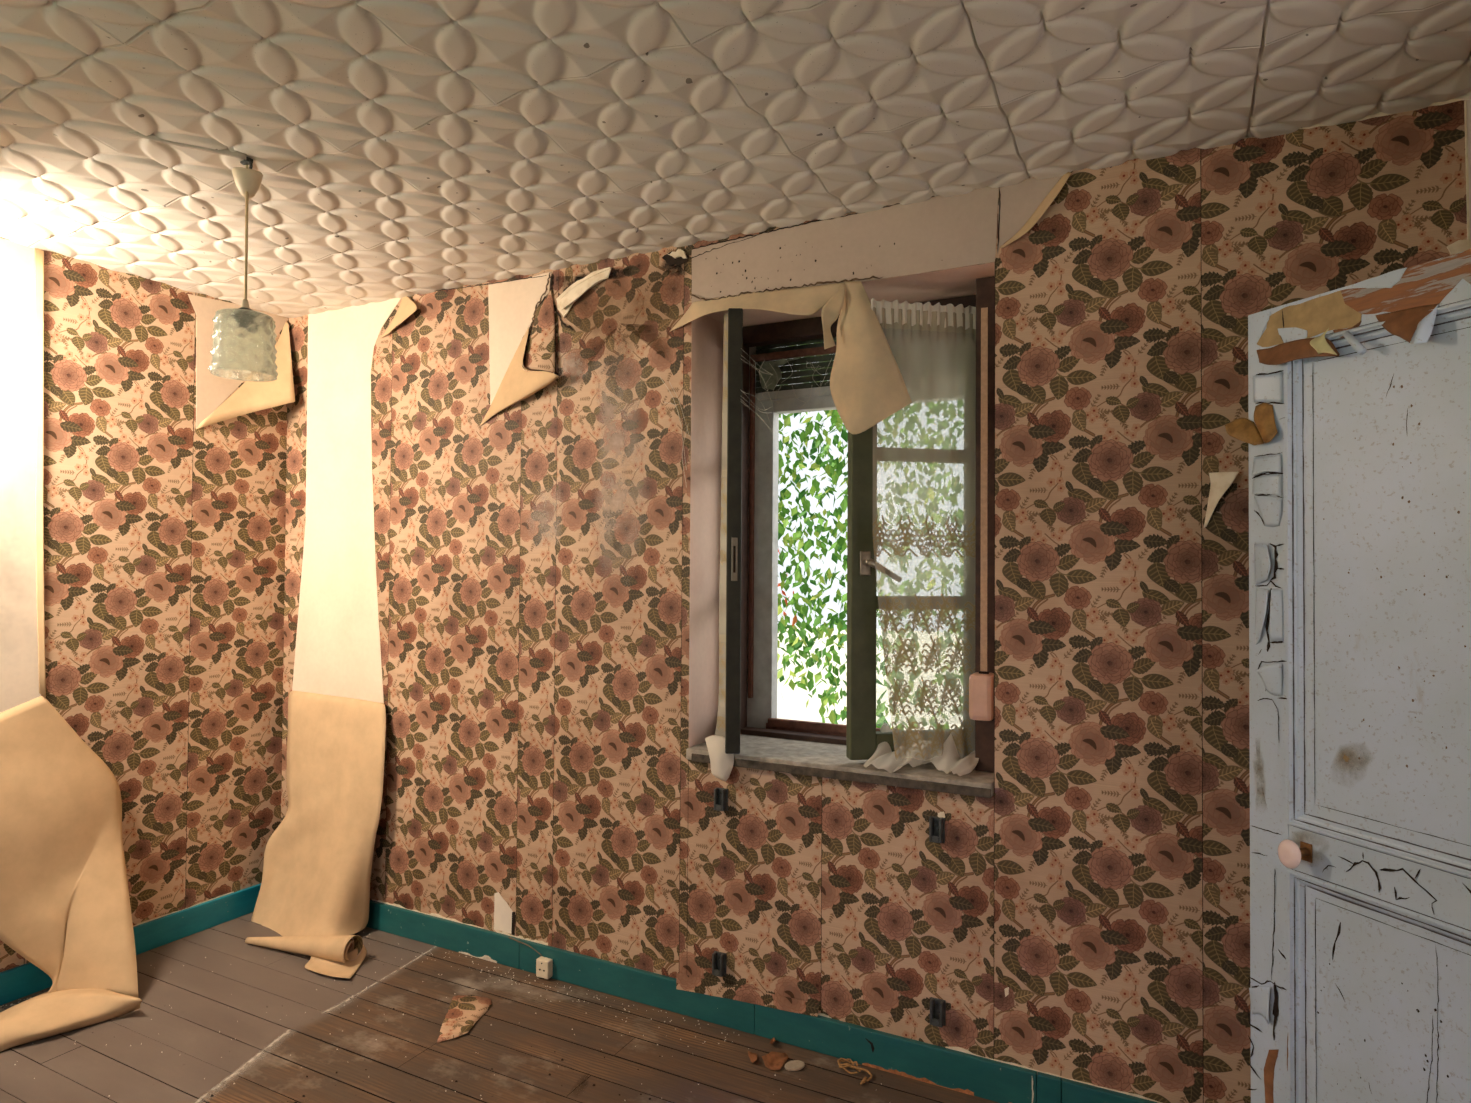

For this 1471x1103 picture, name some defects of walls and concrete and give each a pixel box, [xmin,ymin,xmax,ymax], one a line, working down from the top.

peeling [1257,328,1367,365]
peeling [1375,304,1439,344]
crack [1323,854,1471,913]
crack [1332,922,1345,1001]
crack [1427,953,1439,1102]